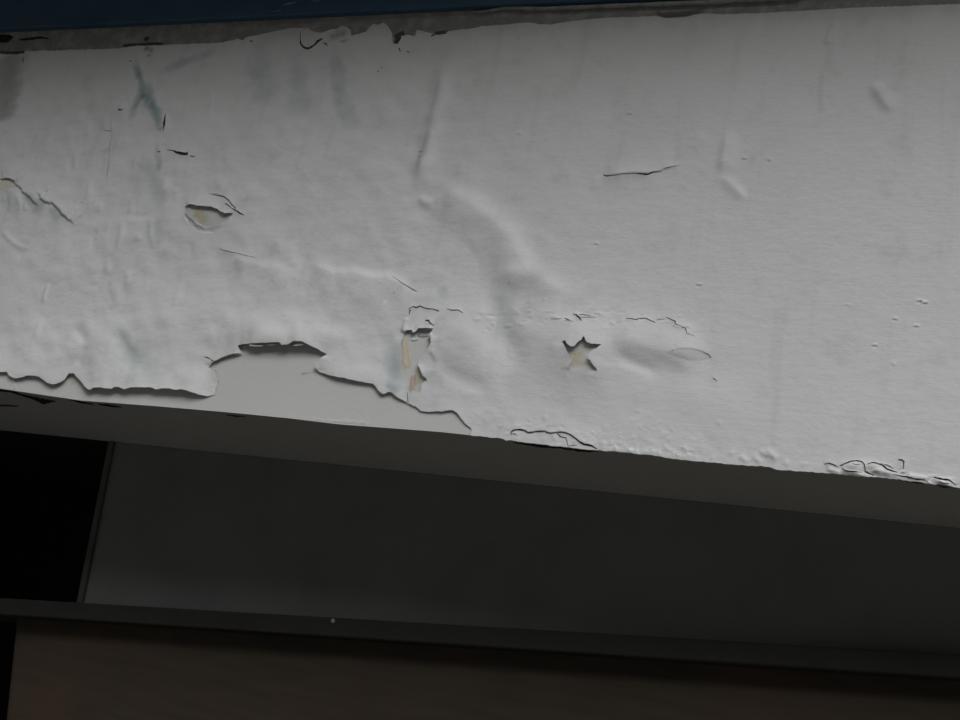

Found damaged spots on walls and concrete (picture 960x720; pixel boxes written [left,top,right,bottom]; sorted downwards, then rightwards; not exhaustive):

peeling [0,0,960,102]
crack [604,166,673,177]
peeling [182,192,244,236]
crack [626,317,693,336]
peeling [0,304,483,435]
peeling [555,330,606,376]
crack [514,442,594,452]